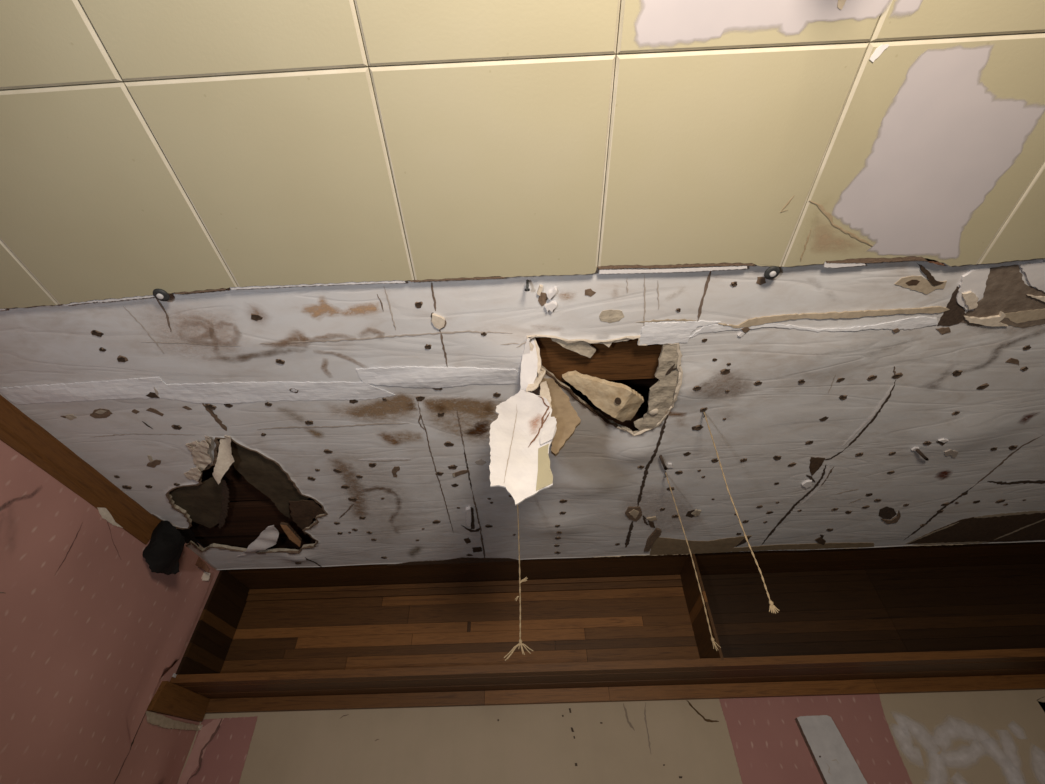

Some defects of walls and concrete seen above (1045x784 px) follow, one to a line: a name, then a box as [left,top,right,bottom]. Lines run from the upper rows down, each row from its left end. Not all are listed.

spalling [870,44,889,62]
water stain [305,300,376,317]
water stain [347,396,499,437]
spalling [551,338,630,358]
crack [625,415,668,548]
spalling [634,344,683,431]
crack [762,366,896,544]
crack [904,436,1045,540]